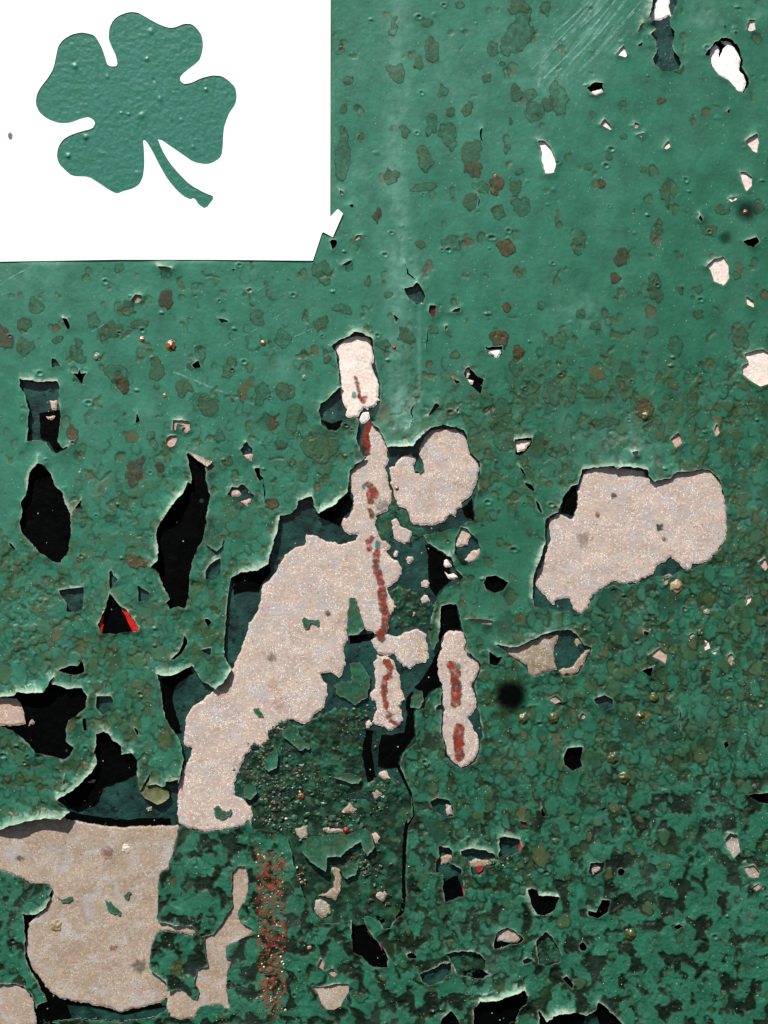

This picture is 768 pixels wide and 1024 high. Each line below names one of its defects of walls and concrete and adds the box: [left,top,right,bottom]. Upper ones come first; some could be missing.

peeling [706,20,755,93]
corrosion [361,422,373,455]
corrosion [365,482,378,518]
peeling [530,451,727,613]
corrosion [365,535,390,642]
peeling [0,329,493,1024]
corrosion [381,659,400,725]
corrosion [447,661,462,707]
peeling [497,629,591,676]
corrosion [453,723,465,761]
corrosion [256,852,306,1015]